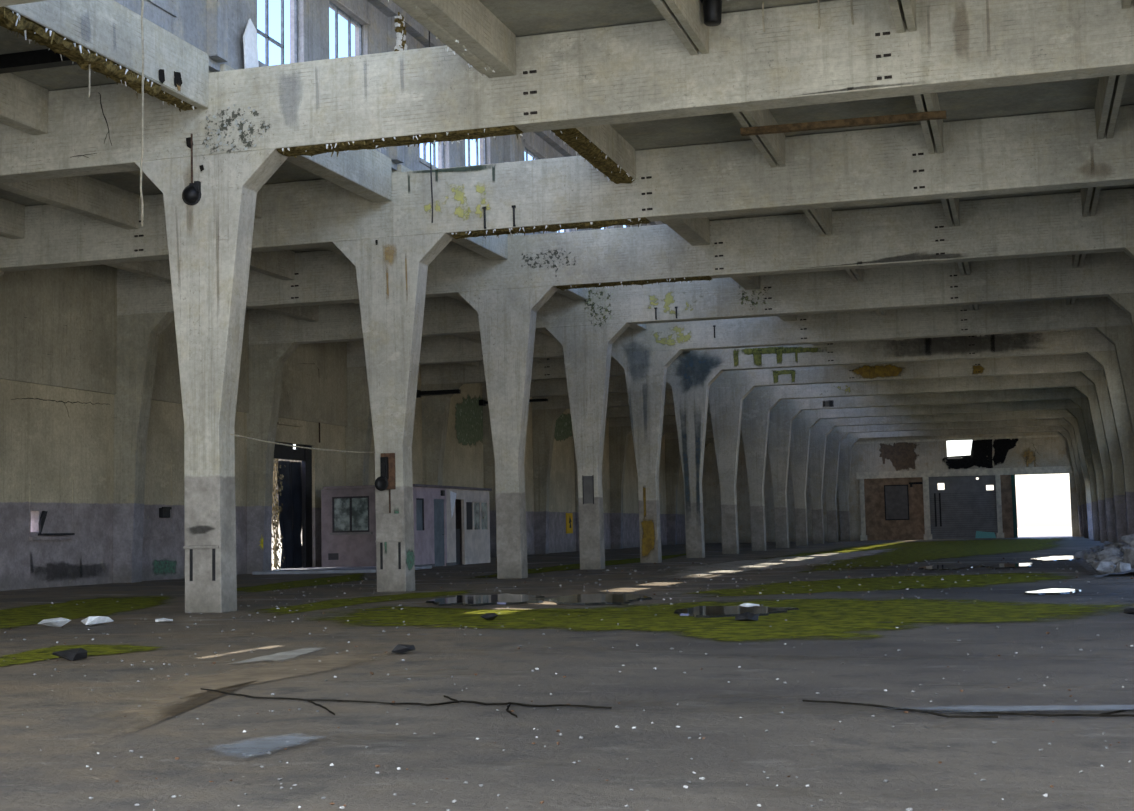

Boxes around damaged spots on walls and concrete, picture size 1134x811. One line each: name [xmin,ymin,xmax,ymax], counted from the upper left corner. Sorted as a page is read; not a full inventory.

water stain [522,250,576,277]
crack [200,688,612,717]
crack [802,700,1134,718]